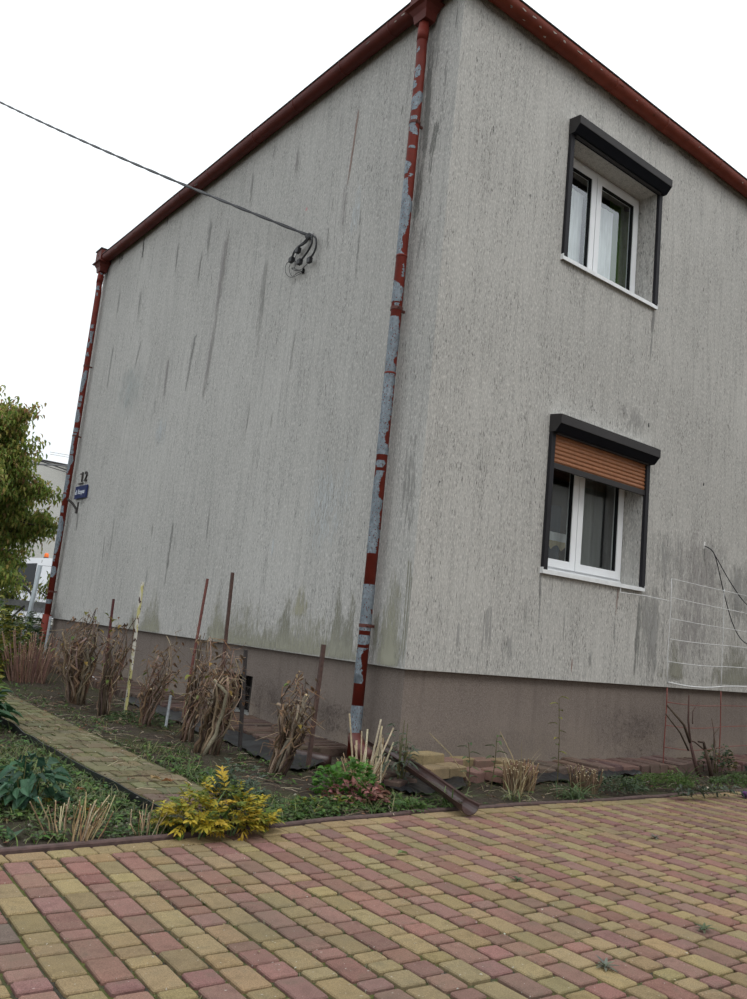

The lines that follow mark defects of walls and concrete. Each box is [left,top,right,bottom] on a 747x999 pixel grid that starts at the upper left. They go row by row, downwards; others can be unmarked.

peeling [409,46,423,148]
water stain [202,232,229,395]
peeling [366,161,413,553]
peeling [50,370,88,577]
peeling [354,584,375,684]
water stain [633,531,747,682]
peeling [349,705,364,733]